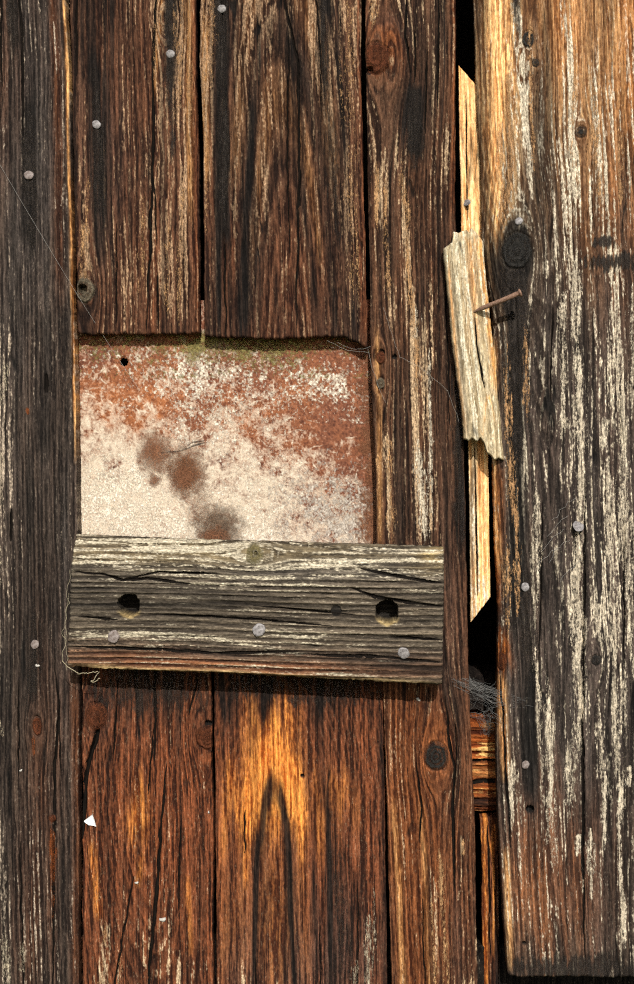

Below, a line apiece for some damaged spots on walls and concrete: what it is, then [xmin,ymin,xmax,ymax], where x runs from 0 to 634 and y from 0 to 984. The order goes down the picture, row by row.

crack [284,0,322,331]
rust [140,432,204,497]
rust [355,353,376,544]
rust [194,509,238,540]
crack [78,614,118,622]
crack [75,571,218,584]
crack [153,568,443,626]
crack [52,636,442,984]